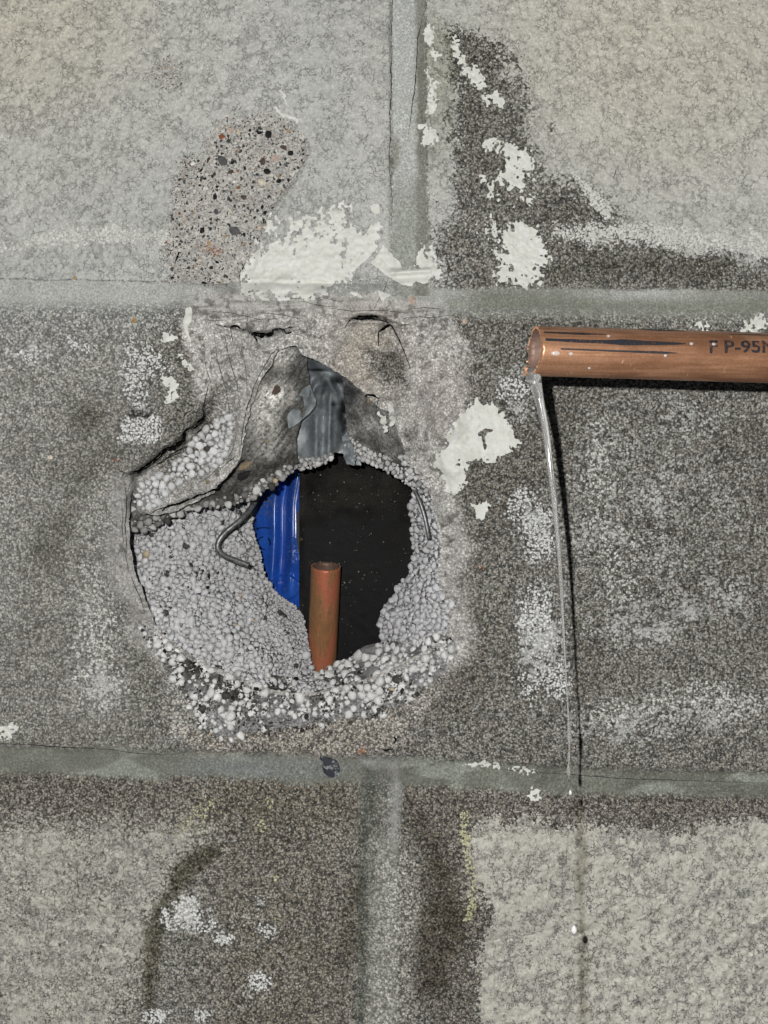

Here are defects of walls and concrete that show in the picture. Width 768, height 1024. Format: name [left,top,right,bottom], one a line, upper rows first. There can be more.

spalling [158,90,443,301]
crack [389,0,422,222]
water stain [548,162,768,264]
peeling [161,307,192,343]
spalling [129,346,311,534]
crack [121,279,448,609]
spalling [342,376,431,497]
peeling [433,397,522,495]
efflorescence [497,485,767,738]
crack [500,769,753,783]